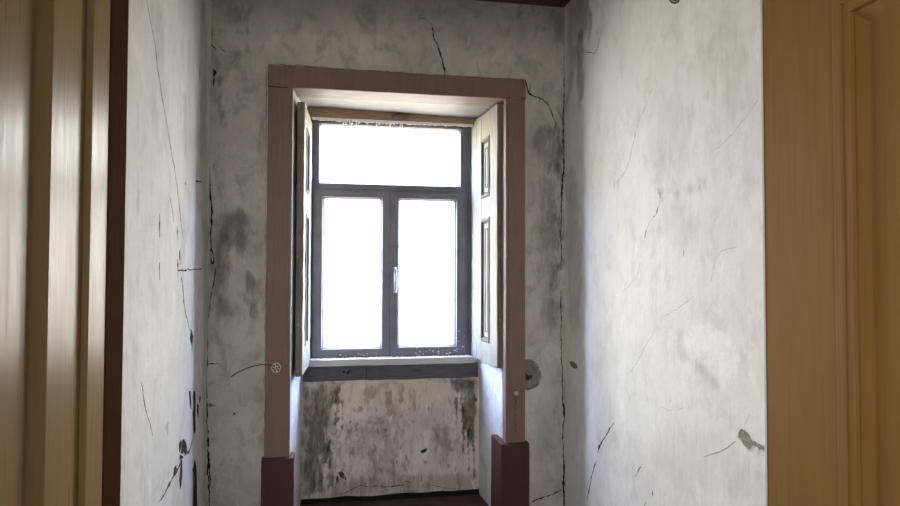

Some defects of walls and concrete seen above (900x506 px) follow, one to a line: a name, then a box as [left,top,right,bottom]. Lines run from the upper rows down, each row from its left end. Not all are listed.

crack [266,9,445,165]
crack [147,3,220,367]
crack [159,403,211,506]
peeling [173,390,216,506]
water stain [304,378,476,493]
crack [532,298,565,506]
crack [587,423,614,498]
flaking render [737,428,764,455]